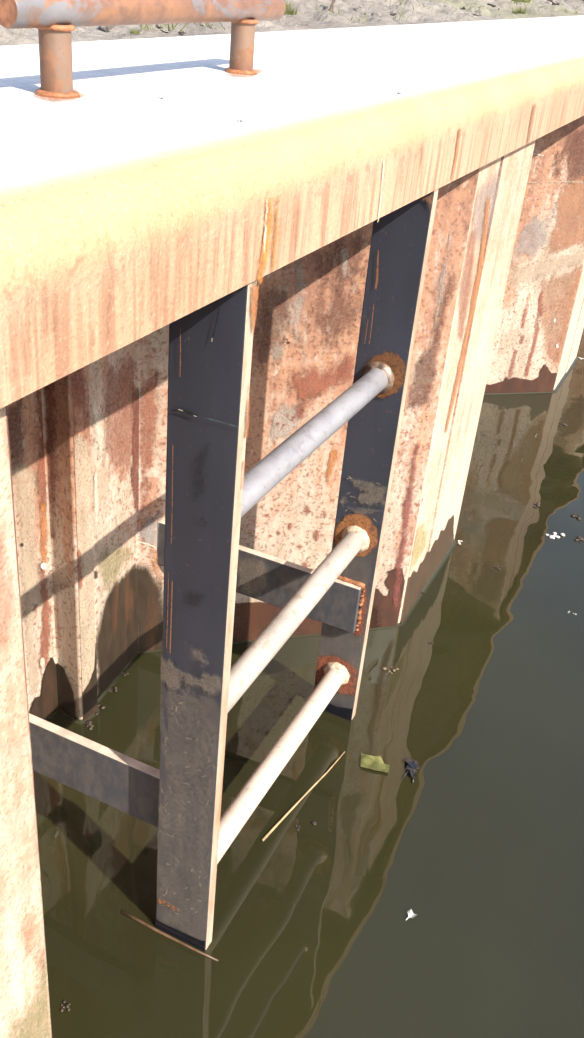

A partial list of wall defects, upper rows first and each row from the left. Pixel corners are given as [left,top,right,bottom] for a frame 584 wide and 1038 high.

corrosion [550,130,584,252]
corrosion [251,198,290,364]
corrosion [312,237,365,344]
corrosion [445,199,490,431]
corrosion [508,292,543,378]
corrosion [9,400,24,465]
corrosion [72,368,88,443]
corrosion [105,361,158,512]
corrosion [34,382,56,668]
corrosion [334,513,378,557]
corrosion [393,445,420,610]
corrosion [316,656,358,695]